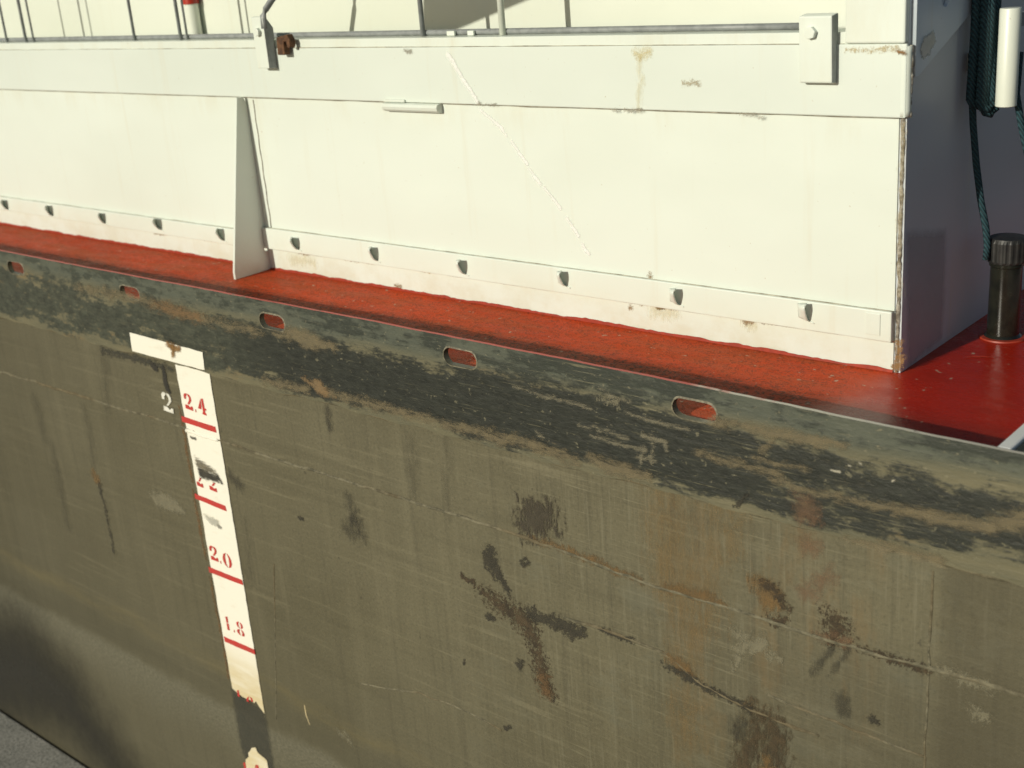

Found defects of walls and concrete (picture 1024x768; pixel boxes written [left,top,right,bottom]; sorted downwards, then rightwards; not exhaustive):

peeling [76,285,338,350]
corrosion [890,338,905,373]
peeling [261,377,652,481]
corrosion [460,545,634,705]
corrosion [746,575,792,629]
corrosion [818,605,933,675]
corrosion [659,654,794,768]